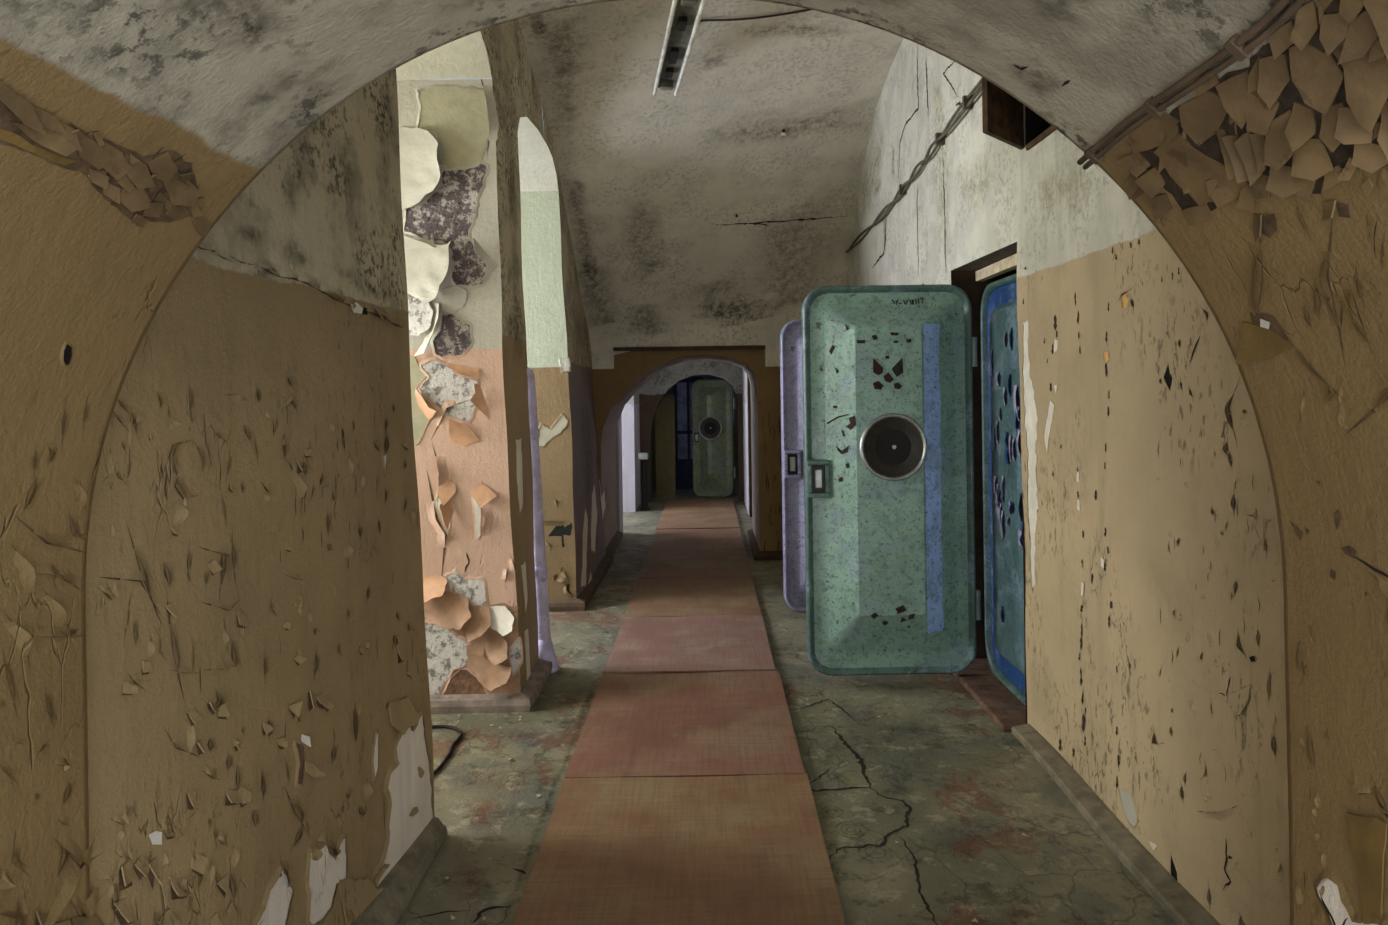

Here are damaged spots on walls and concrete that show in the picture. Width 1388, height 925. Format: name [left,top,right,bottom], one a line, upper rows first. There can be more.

flaking render [0,375,434,925]
flaking render [0,79,531,695]
flaking render [538,412,570,448]
crack [792,699,938,925]
peeling [1116,0,1388,662]
flaking render [1274,725,1388,925]